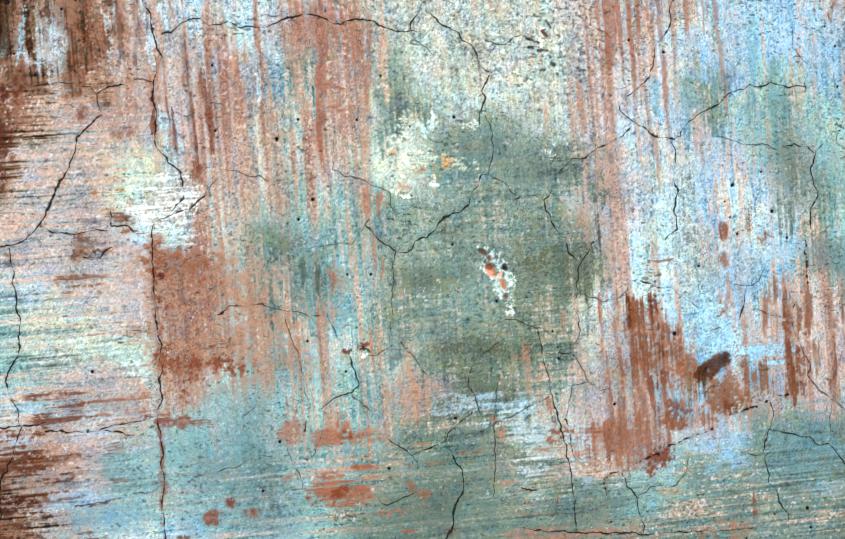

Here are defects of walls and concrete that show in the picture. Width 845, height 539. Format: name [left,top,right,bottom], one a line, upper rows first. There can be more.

crack [0,0,432,539]
crack [217,0,808,539]
crack [710,124,845,523]